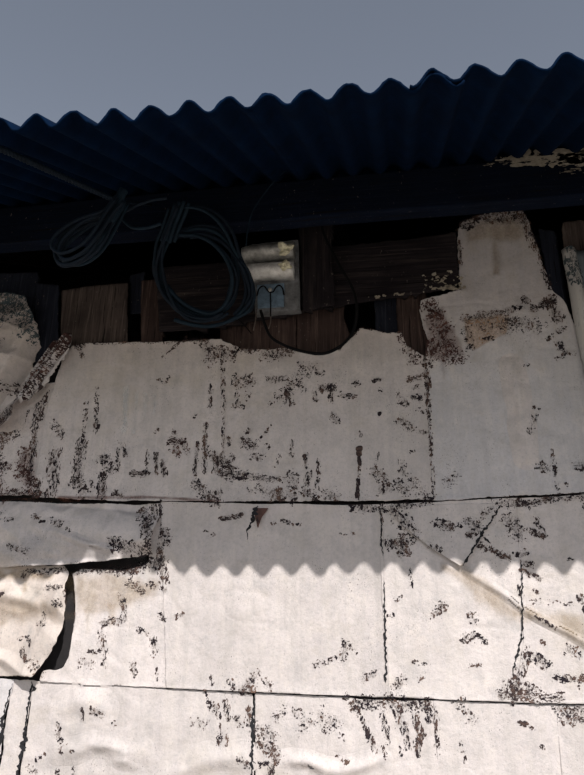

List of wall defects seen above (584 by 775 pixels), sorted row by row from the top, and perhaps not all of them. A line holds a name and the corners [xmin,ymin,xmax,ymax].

peeling [483,148,584,174]
peeling [0,210,584,679]
crack [378,509,386,554]
crack [463,505,501,566]
crack [381,582,389,682]
crack [513,561,524,671]
crack [0,681,37,775]
crack [248,695,256,775]
peeling [342,673,440,760]